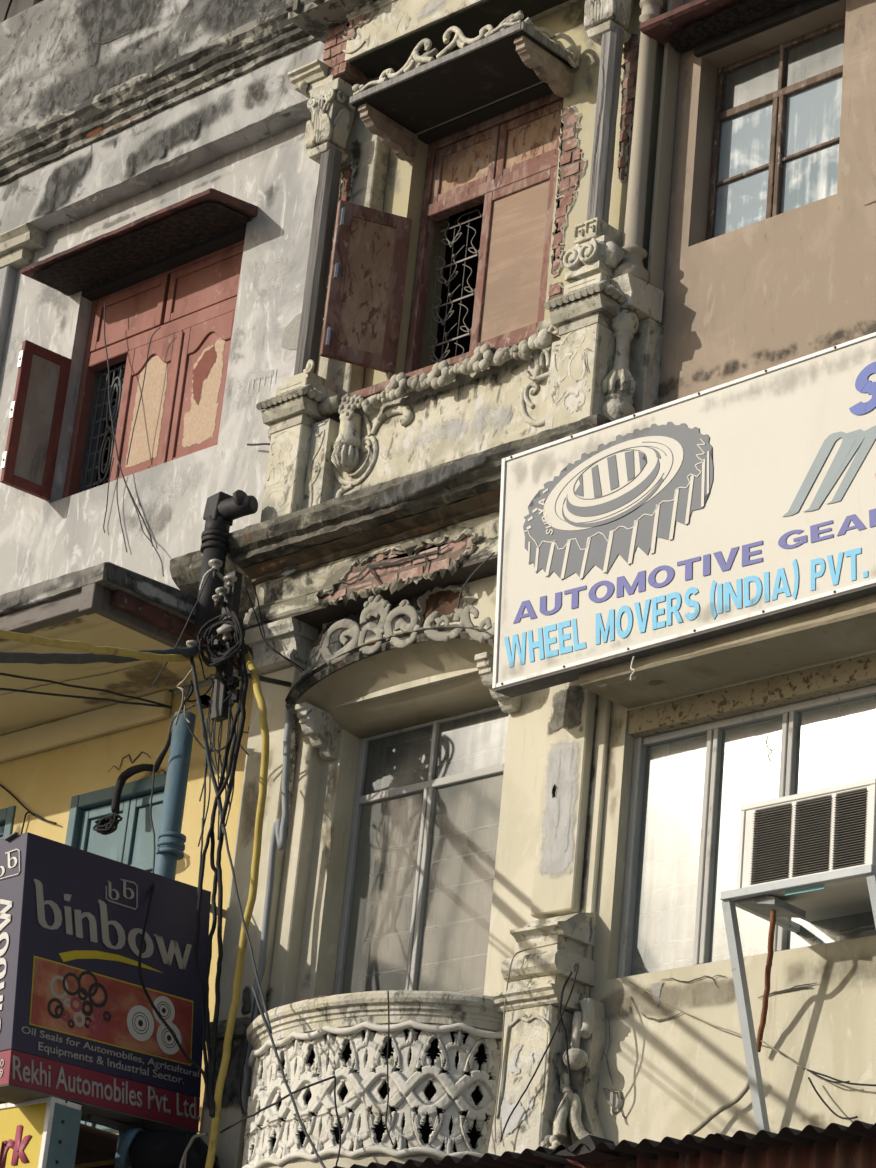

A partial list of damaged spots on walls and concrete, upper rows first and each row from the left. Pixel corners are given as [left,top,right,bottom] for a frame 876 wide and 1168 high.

water stain [0,40,57,86]
water stain [37,0,188,113]
water stain [245,79,297,121]
spalling [617,32,640,183]
water stain [125,97,230,184]
spalling [548,106,588,310]
water stain [658,361,744,396]
spalling [316,528,479,627]
peeling [548,685,583,734]
crack [662,975,726,988]
crack [641,1012,682,1022]
peeling [500,1095,534,1135]